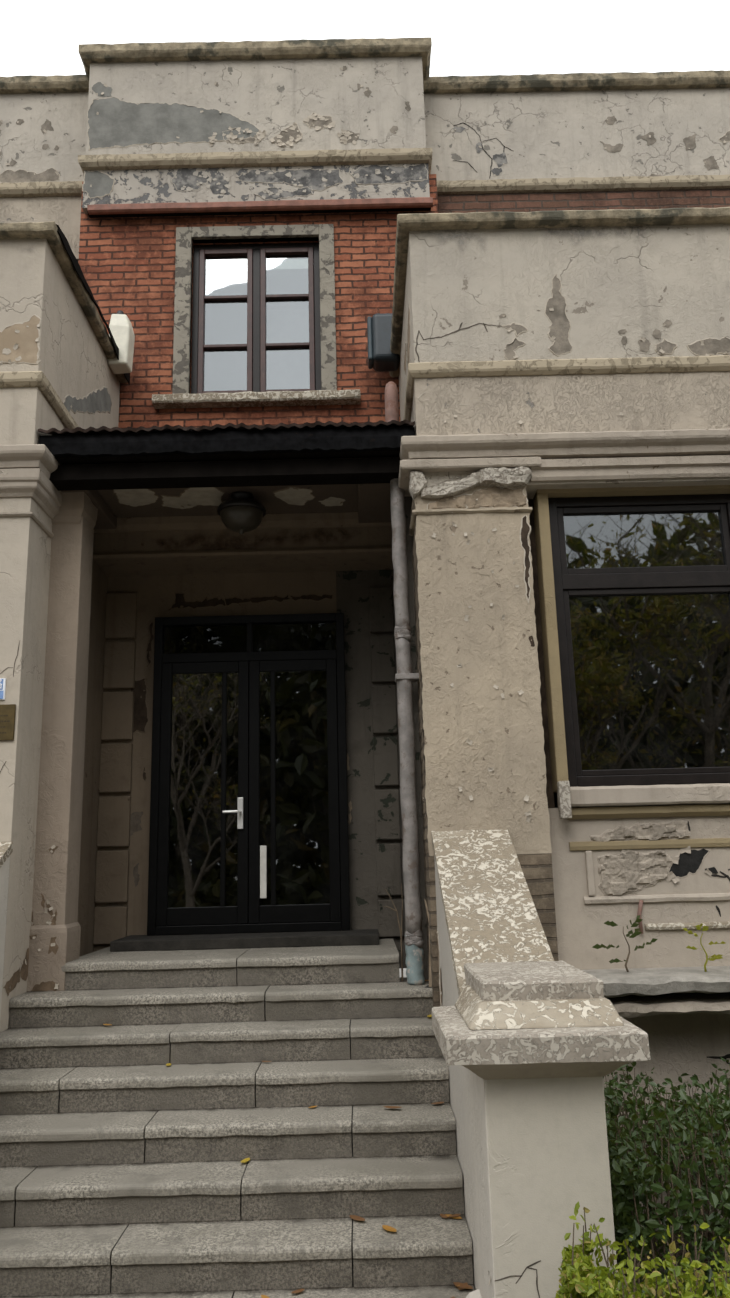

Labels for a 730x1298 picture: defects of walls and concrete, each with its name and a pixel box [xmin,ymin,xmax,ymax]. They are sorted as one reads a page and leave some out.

peeling [87,82,359,151]
peeling [0,151,60,183]
peeling [171,163,428,201]
crack [453,123,513,179]
peeling [0,314,42,365]
crack [415,322,504,361]
peeling [544,274,573,357]
peeling [618,319,730,356]
peeling [113,487,225,509]
peeling [273,486,345,506]
peeling [589,819,718,896]
peeling [3,894,59,995]